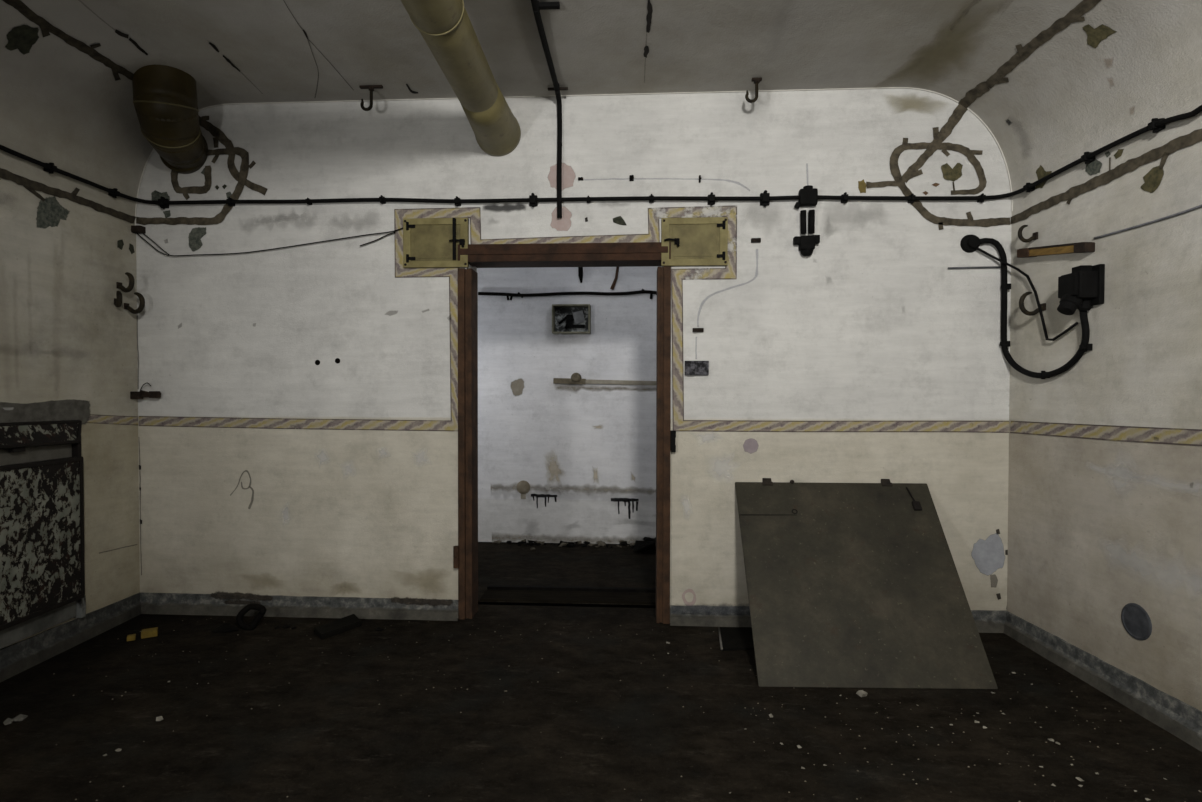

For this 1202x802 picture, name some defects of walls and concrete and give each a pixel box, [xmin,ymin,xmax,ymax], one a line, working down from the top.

crack [644,0,653,58]